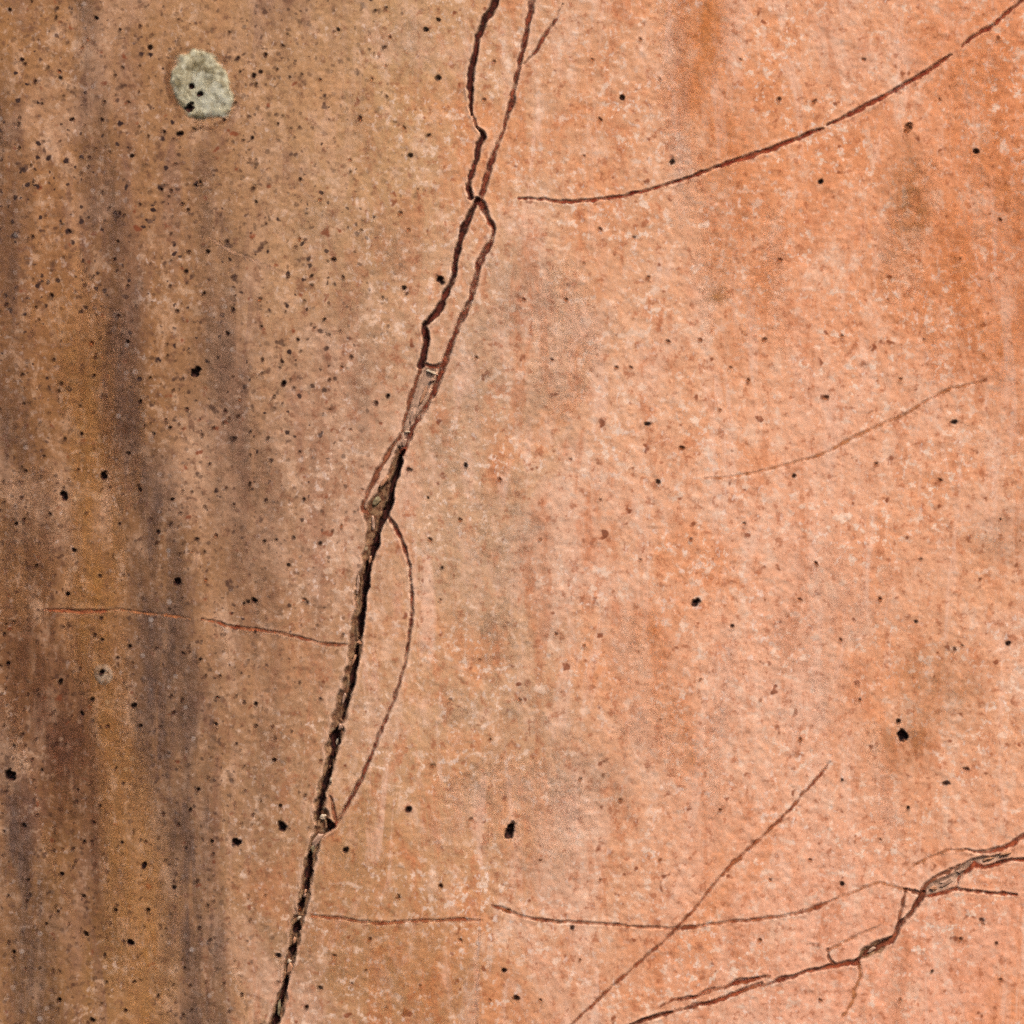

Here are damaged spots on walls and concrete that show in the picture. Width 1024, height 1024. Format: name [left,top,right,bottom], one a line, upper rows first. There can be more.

crack [518,0,1024,204]
crack [48,0,557,1024]
damp [37,696,84,780]
damp [138,583,182,759]
damp [9,800,29,907]
crack [493,772,828,1022]
crack [633,833,1024,1024]